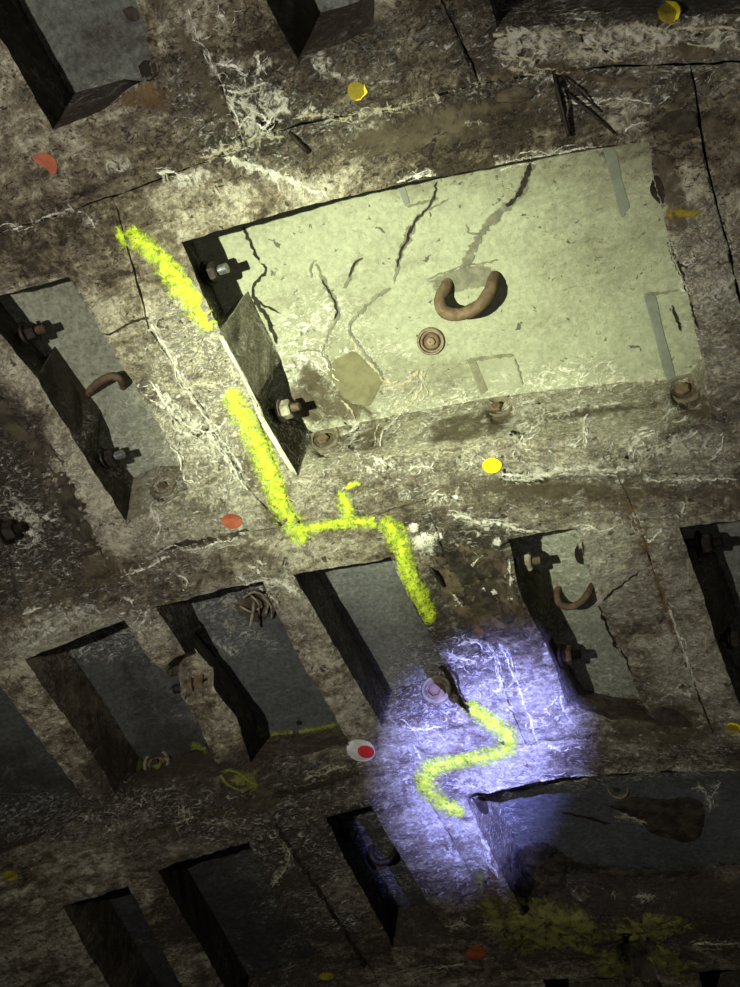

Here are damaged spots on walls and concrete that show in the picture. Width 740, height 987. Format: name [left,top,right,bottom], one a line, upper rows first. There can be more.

efflorescence [493,7,740,80]
leakage [153,0,545,200]
leakage [495,144,611,171]
crack [102,317,149,336]
crack [242,119,455,377]
crack [459,161,535,272]
crack [667,243,699,329]
leakage [143,324,248,490]
leakage [0,398,249,654]
rust [621,497,676,634]
crack [598,571,639,674]
spalling [609,797,705,842]